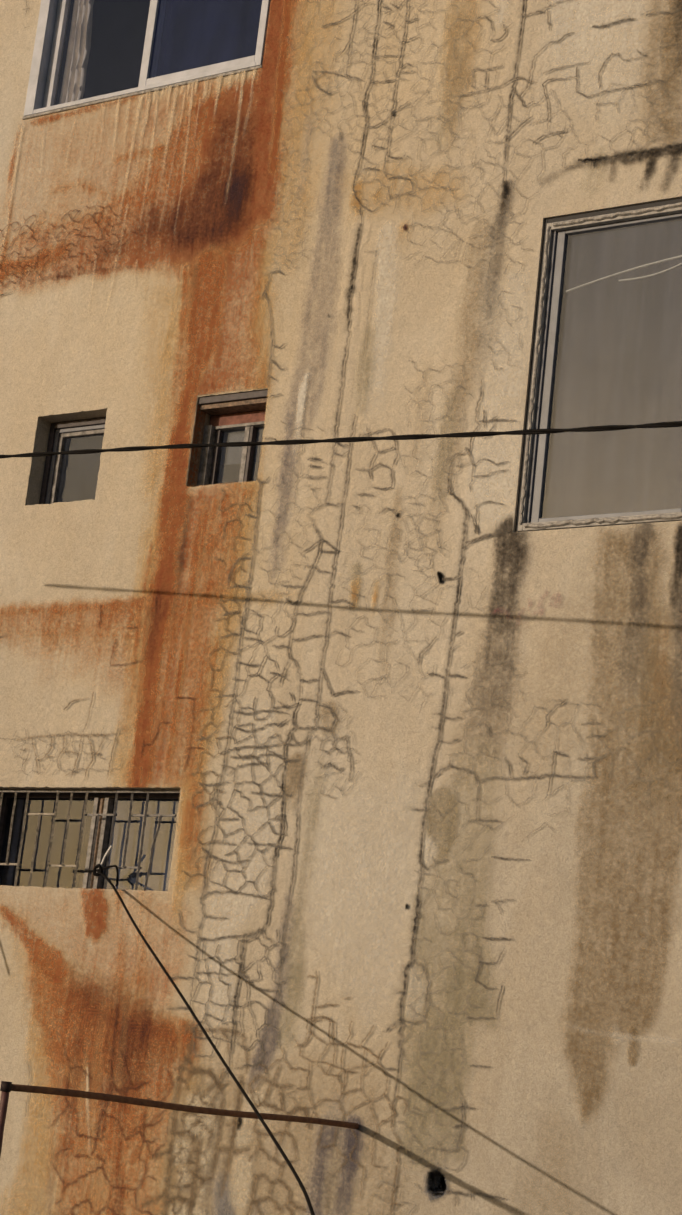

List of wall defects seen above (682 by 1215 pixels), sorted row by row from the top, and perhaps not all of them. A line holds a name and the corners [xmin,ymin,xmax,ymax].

crack [312,0,417,333]
crack [454,0,682,180]
leakage [577,0,682,180]
crack [262,270,284,398]
rust [0,0,303,885]
leakage [486,520,526,661]
crack [30,729,119,776]
crack [54,347,602,1215]
leakage [565,521,682,1117]
rust [82,889,114,940]
rust [0,907,197,1215]